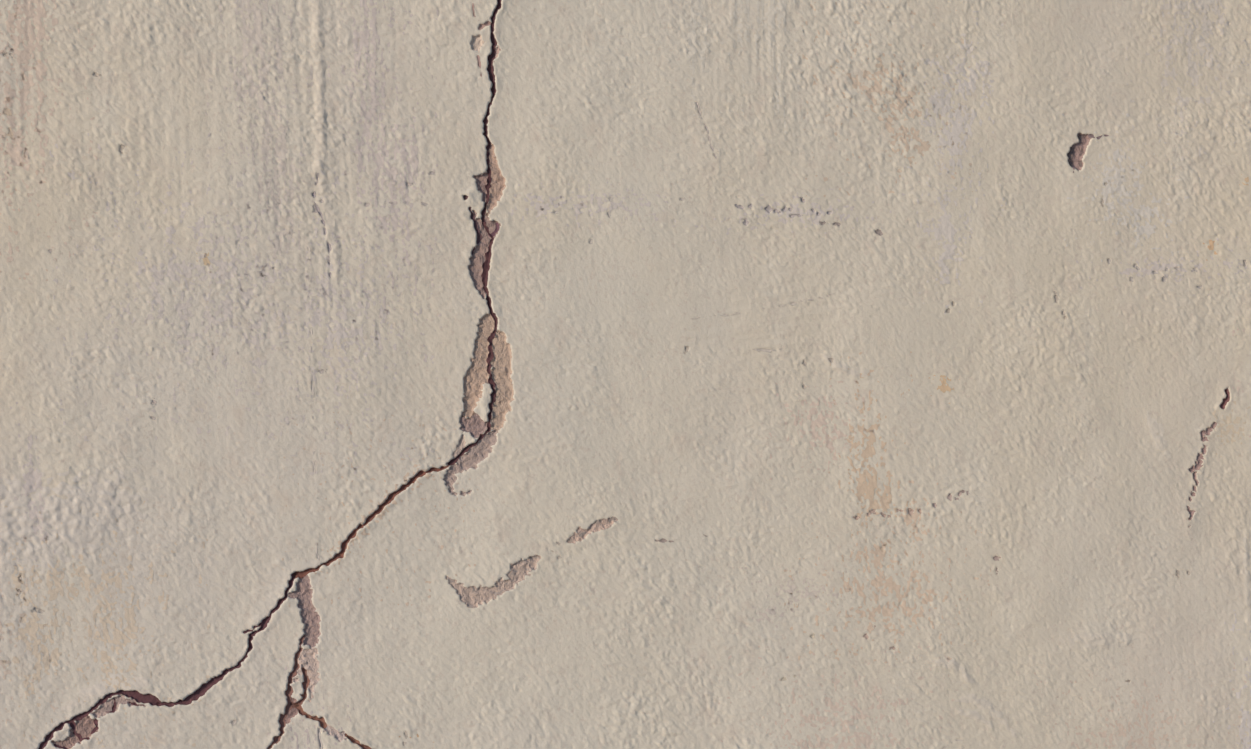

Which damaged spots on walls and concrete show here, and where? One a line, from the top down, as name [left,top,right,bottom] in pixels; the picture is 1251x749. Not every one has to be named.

spalling [466,143,506,299]
spalling [1067,133,1091,171]
crack [39,0,501,749]
spalling [443,313,514,496]
crack [1187,388,1230,527]
spalling [446,516,618,608]
spalling [285,575,321,724]